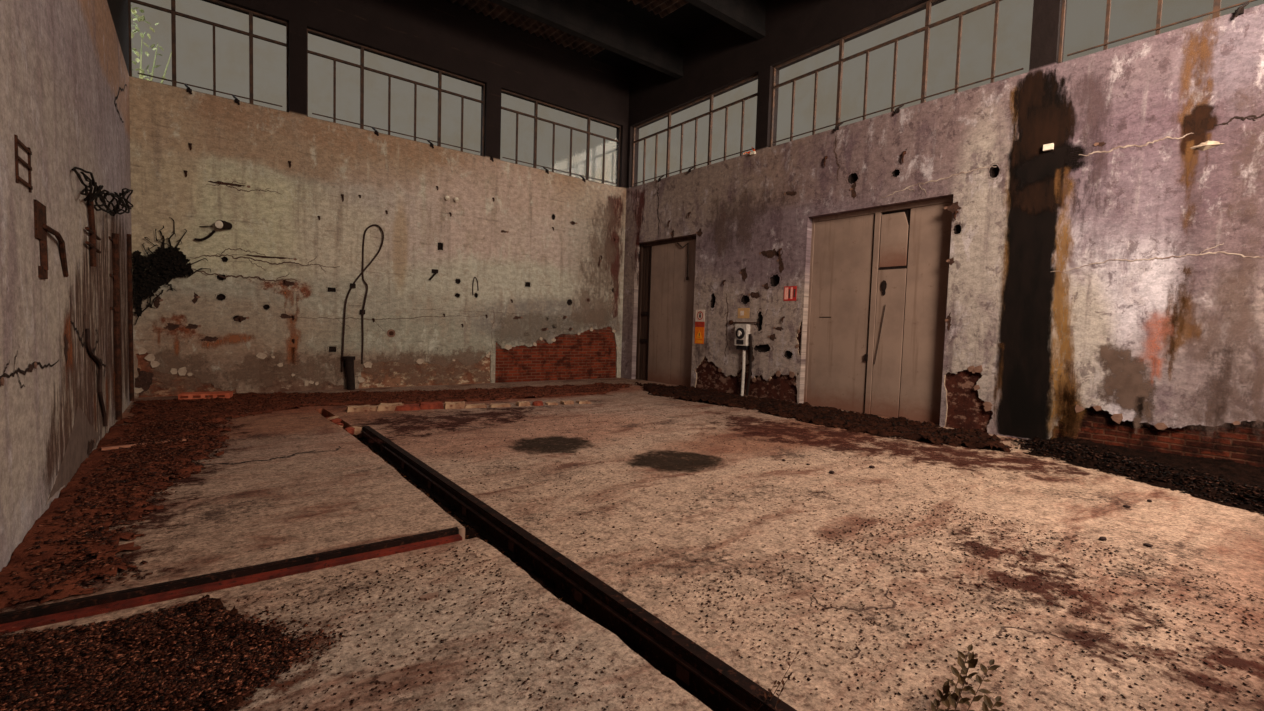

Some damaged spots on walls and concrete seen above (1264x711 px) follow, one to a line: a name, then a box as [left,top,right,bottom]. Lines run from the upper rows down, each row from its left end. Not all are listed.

crack [1079,114,1264,156]
water stain [994,69,1108,440]
crack [1051,243,1264,272]
crack [0,314,106,397]
rust [154,315,253,355]
rust [263,280,310,365]
spalling [256,299,619,393]
spalling [695,248,802,404]
spalling [944,365,993,433]
spalling [1050,405,1264,467]